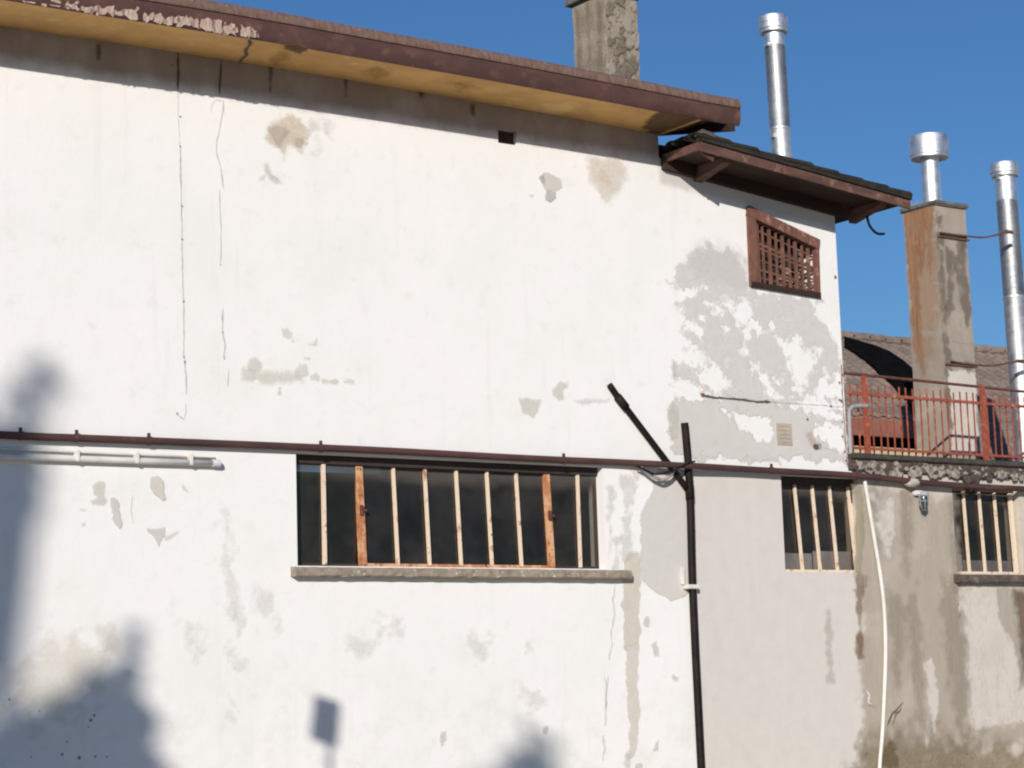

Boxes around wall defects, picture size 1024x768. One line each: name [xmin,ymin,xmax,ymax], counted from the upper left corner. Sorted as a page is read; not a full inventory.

peeling [22,0,259,39]
crack [171,54,180,89]
leakage [267,116,307,151]
spalling [539,172,562,202]
rust [904,206,937,363]
flaking render [668,241,1024,488]
flaking render [93,483,122,528]
flaking render [150,476,166,500]
flaking render [639,469,696,601]
leakage [621,552,641,767]
leakage [853,486,968,768]
leakage [998,587,1024,684]